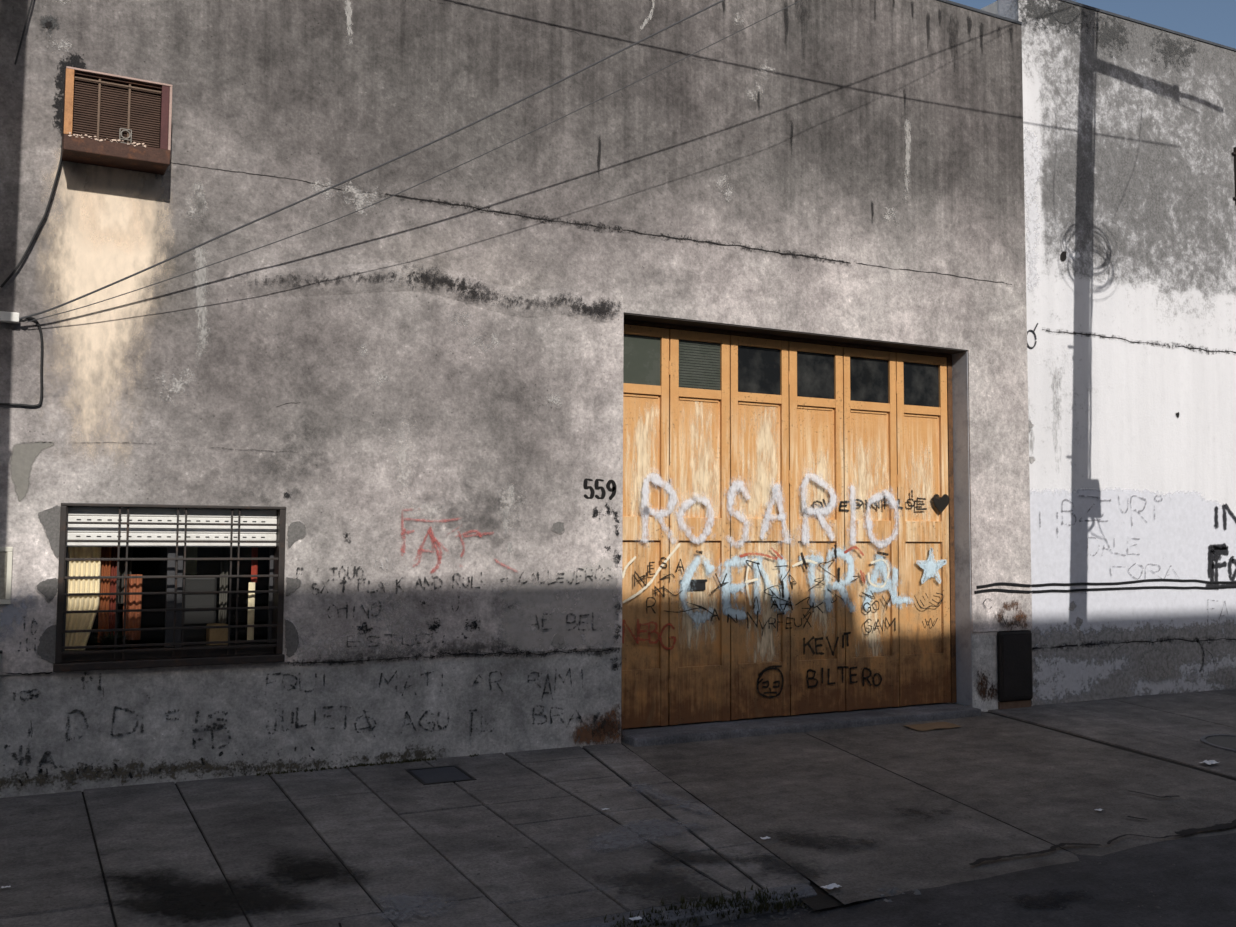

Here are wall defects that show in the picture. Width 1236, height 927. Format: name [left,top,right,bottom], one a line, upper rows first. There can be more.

damp [345,0,353,43]
damp [784,0,809,40]
damp [911,3,983,68]
damp [998,0,1132,58]
damp [1151,34,1199,70]
crack [171,162,1012,285]
damp [50,161,160,432]
crack [1042,329,1236,354]
spalling [1032,602,1236,705]
corrosion [573,704,622,745]